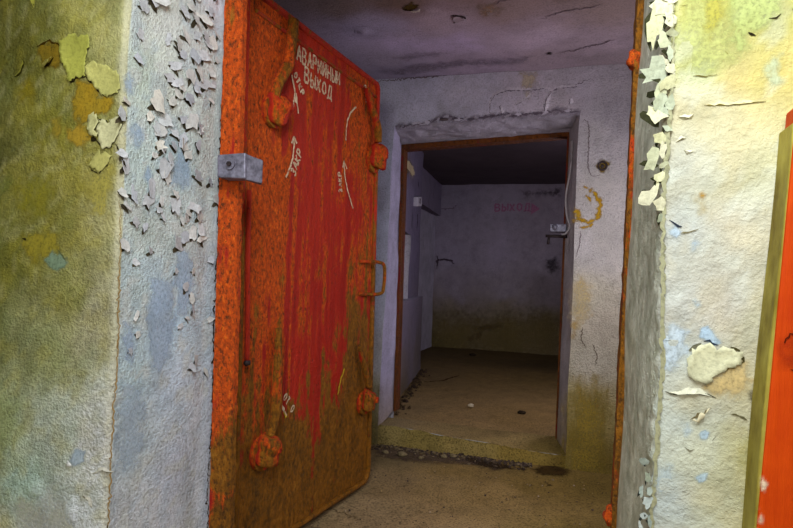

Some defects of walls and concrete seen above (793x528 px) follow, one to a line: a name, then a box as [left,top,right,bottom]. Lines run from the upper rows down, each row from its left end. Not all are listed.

crack [489,79,591,117]
peeling [37,0,221,331]
crack [584,119,599,177]
peeling [22,231,67,270]
peeling [637,0,781,528]